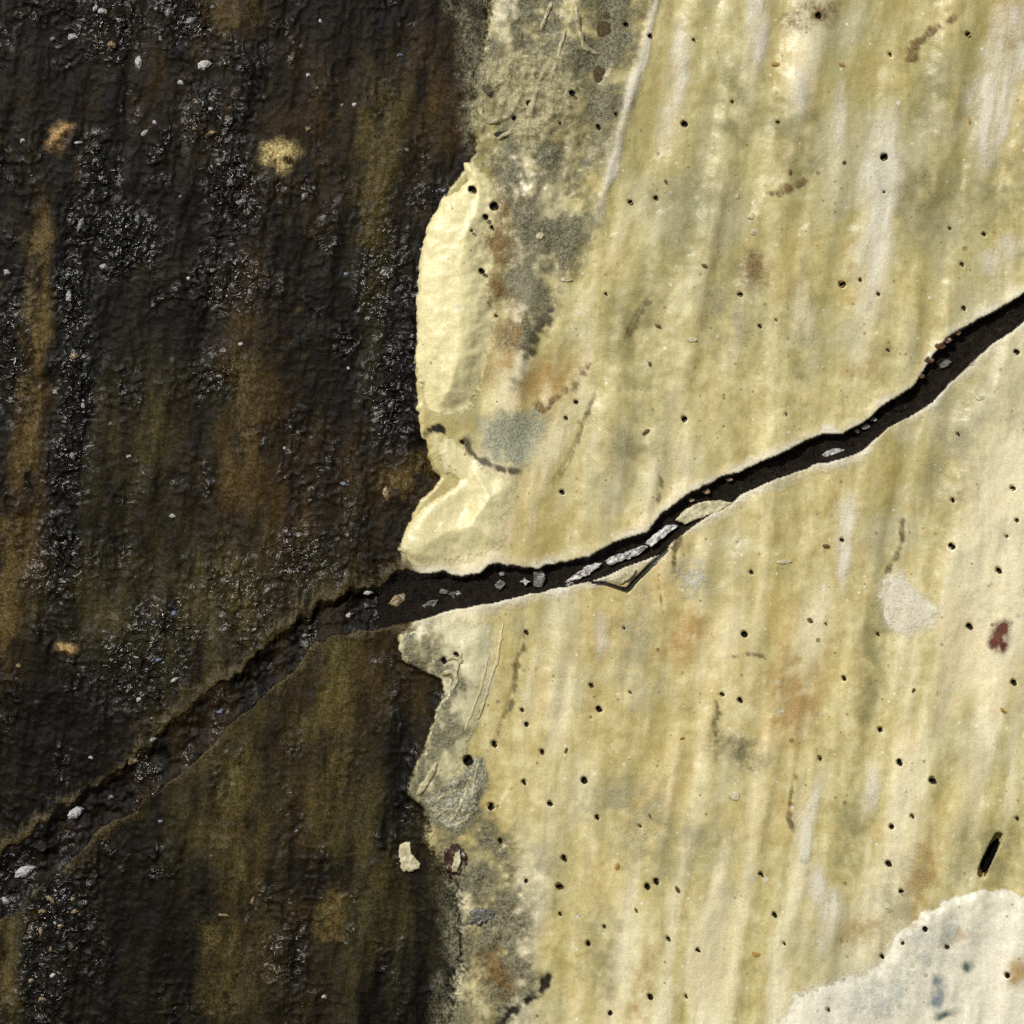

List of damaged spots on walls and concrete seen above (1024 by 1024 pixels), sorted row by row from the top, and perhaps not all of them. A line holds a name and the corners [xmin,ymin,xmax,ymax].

efflorescence [624,0,658,111]
flaking render [48,123,72,147]
flaking render [262,142,298,172]
efflorescence [603,143,621,191]
crack [0,287,1024,931]
flaking render [57,643,76,654]
spalling [416,756,487,876]
spalling [399,842,421,873]
spalling [467,907,496,926]